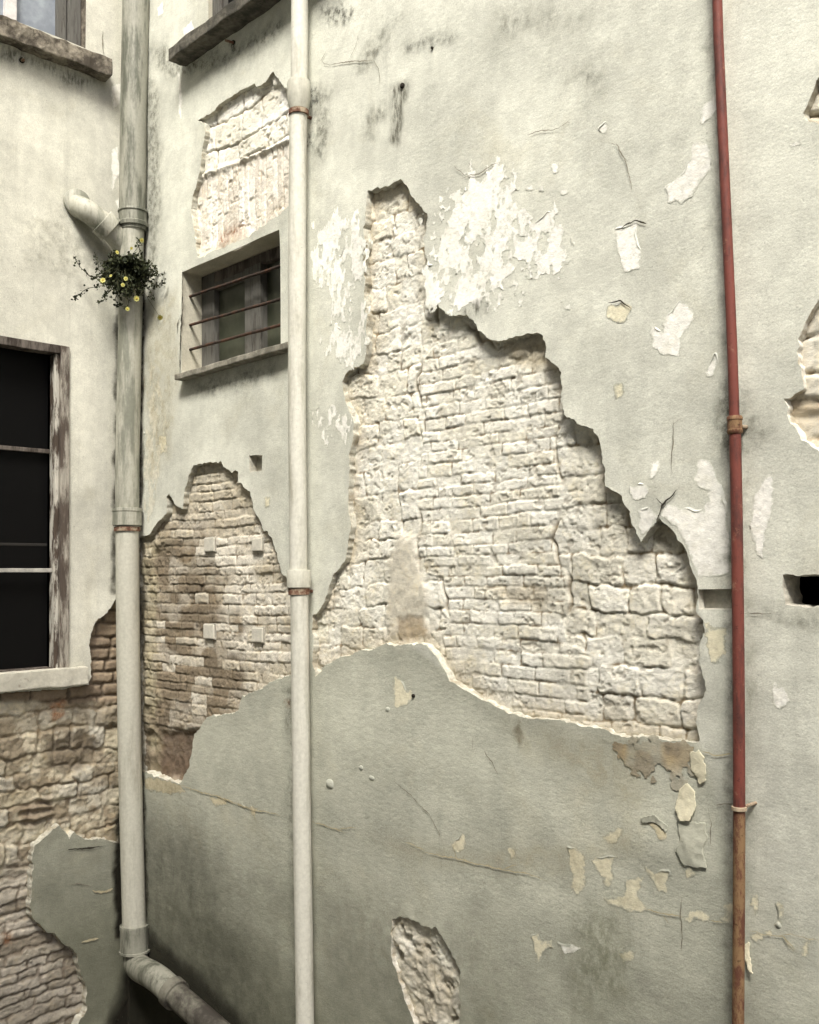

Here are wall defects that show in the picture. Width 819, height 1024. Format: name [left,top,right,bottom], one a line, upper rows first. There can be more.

spalling [191,72,289,264]
leakage [392,84,406,141]
spalling [784,300,819,450]
spalling [139,343,291,795]
spalling [310,156,730,913]
spalling [0,600,119,1024]
spalling [390,916,461,1024]